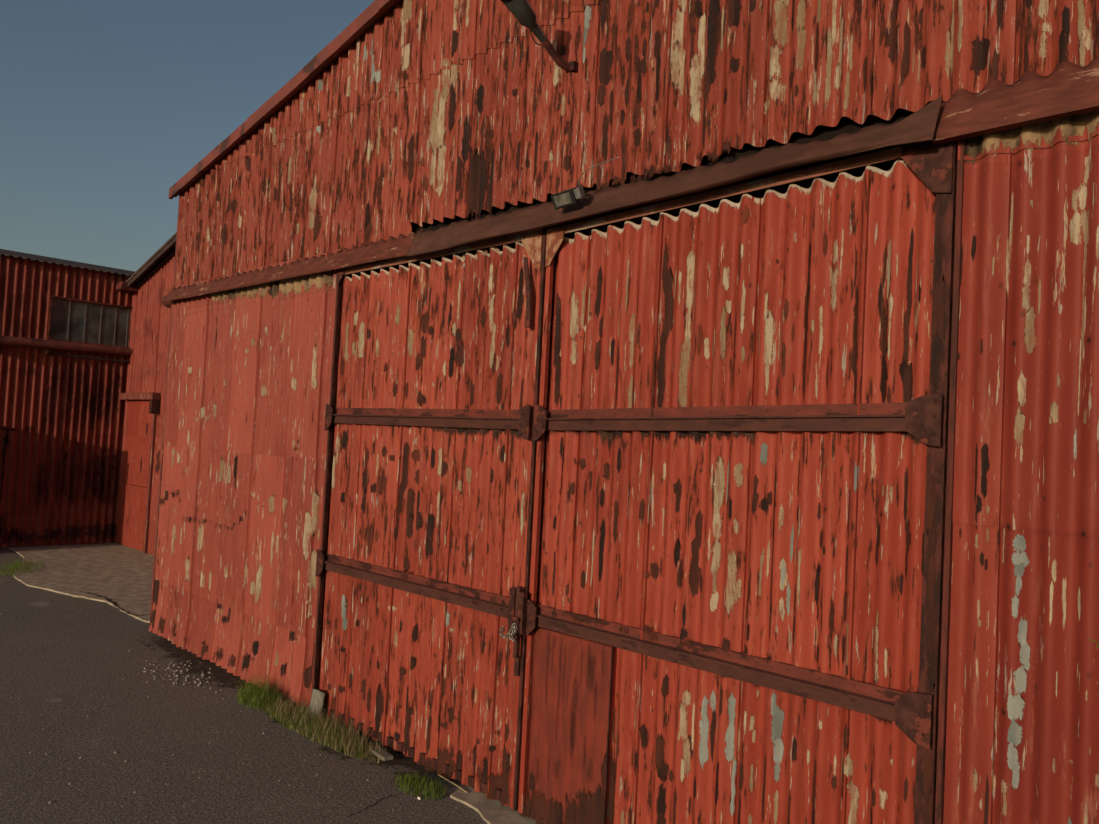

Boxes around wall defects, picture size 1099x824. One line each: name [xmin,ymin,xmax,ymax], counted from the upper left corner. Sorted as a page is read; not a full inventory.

peeling [671,0,706,127]
peeling [764,0,853,114]
water stain [960,110,1099,163]
peeling [564,159,908,244]
peeling [710,456,744,619]
rust [328,661,386,740]
rust [394,656,511,806]
rust [520,749,615,824]
rust [634,723,696,824]
rust [710,685,723,806]
peeling [677,689,756,818]
peeling [1001,528,1030,816]